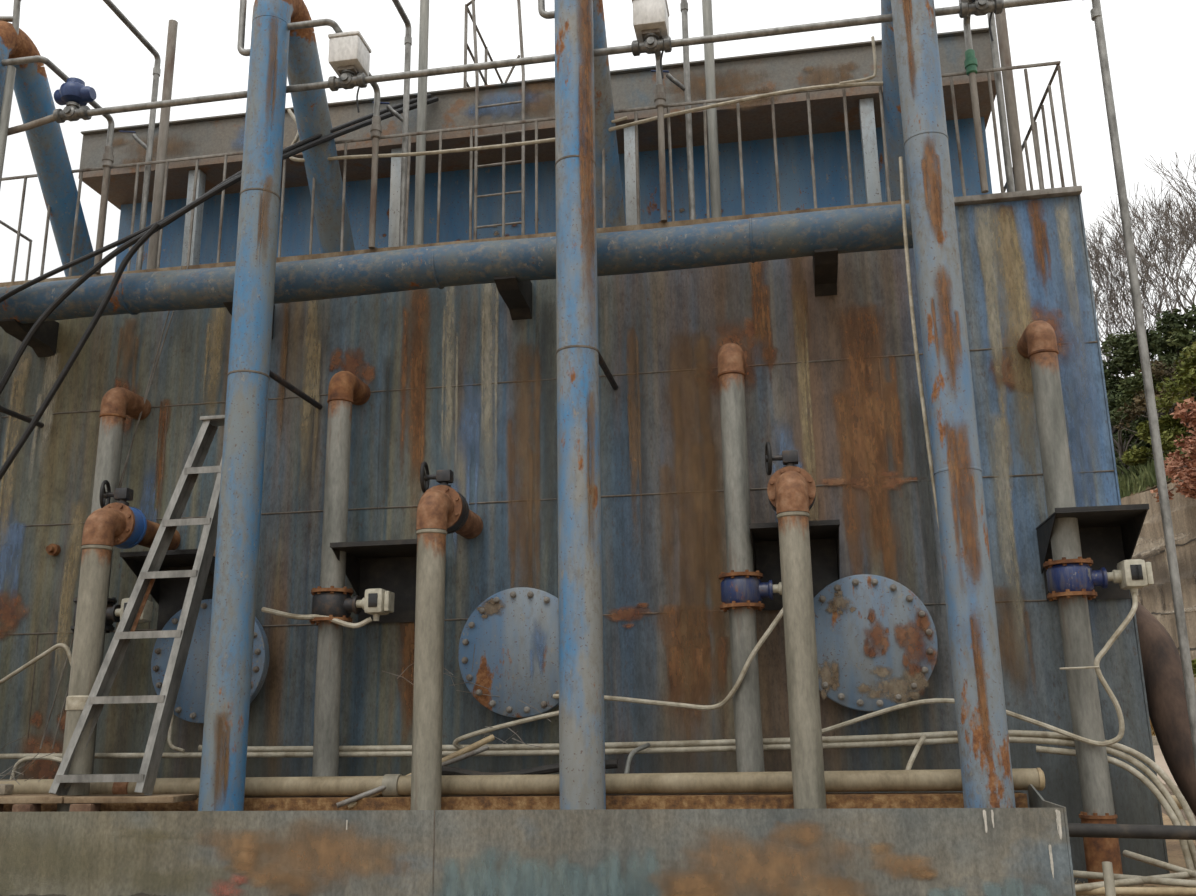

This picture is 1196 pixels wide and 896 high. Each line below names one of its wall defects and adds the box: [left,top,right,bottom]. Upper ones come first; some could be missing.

corrosion [922,142,942,236]
corrosion [1028,200,1051,274]
corrosion [694,261,777,391]
corrosion [931,269,962,372]
corrosion [400,289,428,473]
corrosion [627,331,641,488]
corrosion [945,423,980,576]
corrosion [399,622,415,728]
corrosion [609,603,648,628]
corrosion [970,618,990,747]
corrosion [997,589,1032,676]